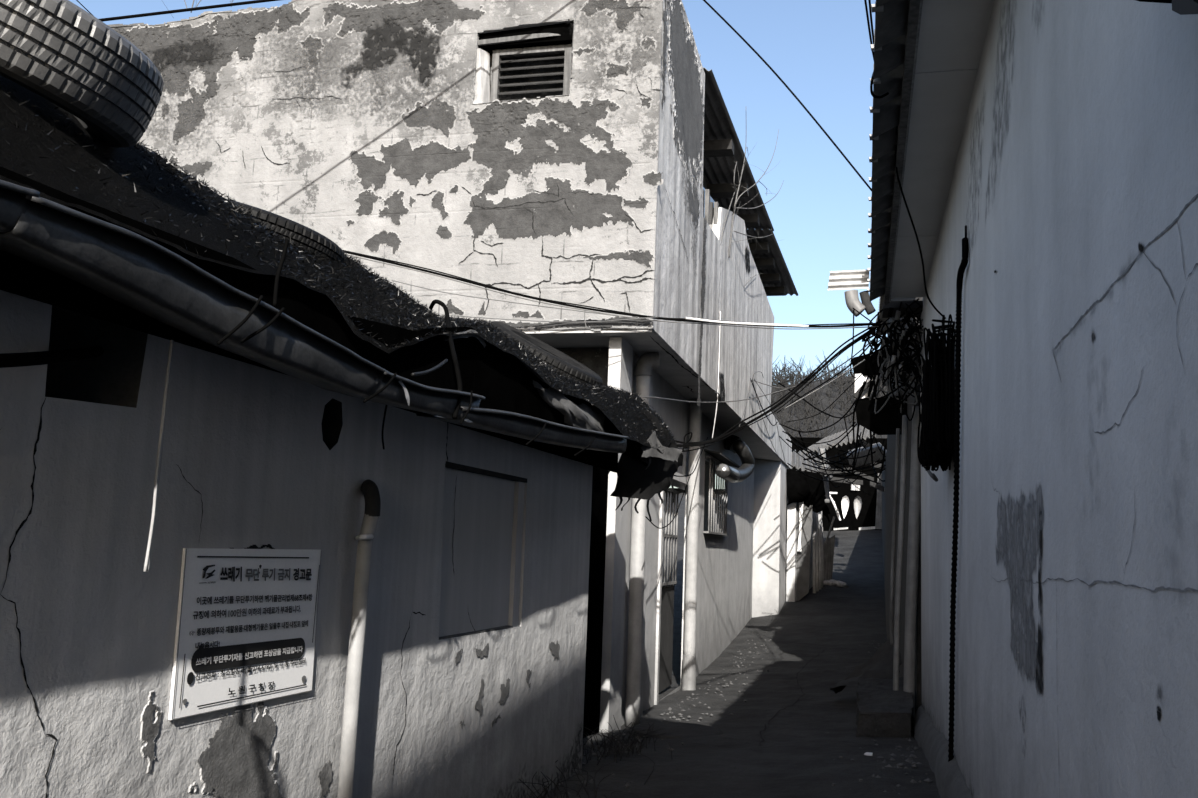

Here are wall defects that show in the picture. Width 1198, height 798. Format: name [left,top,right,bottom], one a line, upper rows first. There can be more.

peeling [114,0,487,181]
peeling [345,96,663,256]
crack [417,155,653,312]
peeling [577,248,656,270]
peeling [579,0,704,229]
crack [625,184,689,263]
crack [1053,194,1198,380]
crack [650,336,722,399]
crack [0,396,57,798]
crack [990,520,1198,617]
peeling [139,689,163,775]
peeling [187,701,283,798]